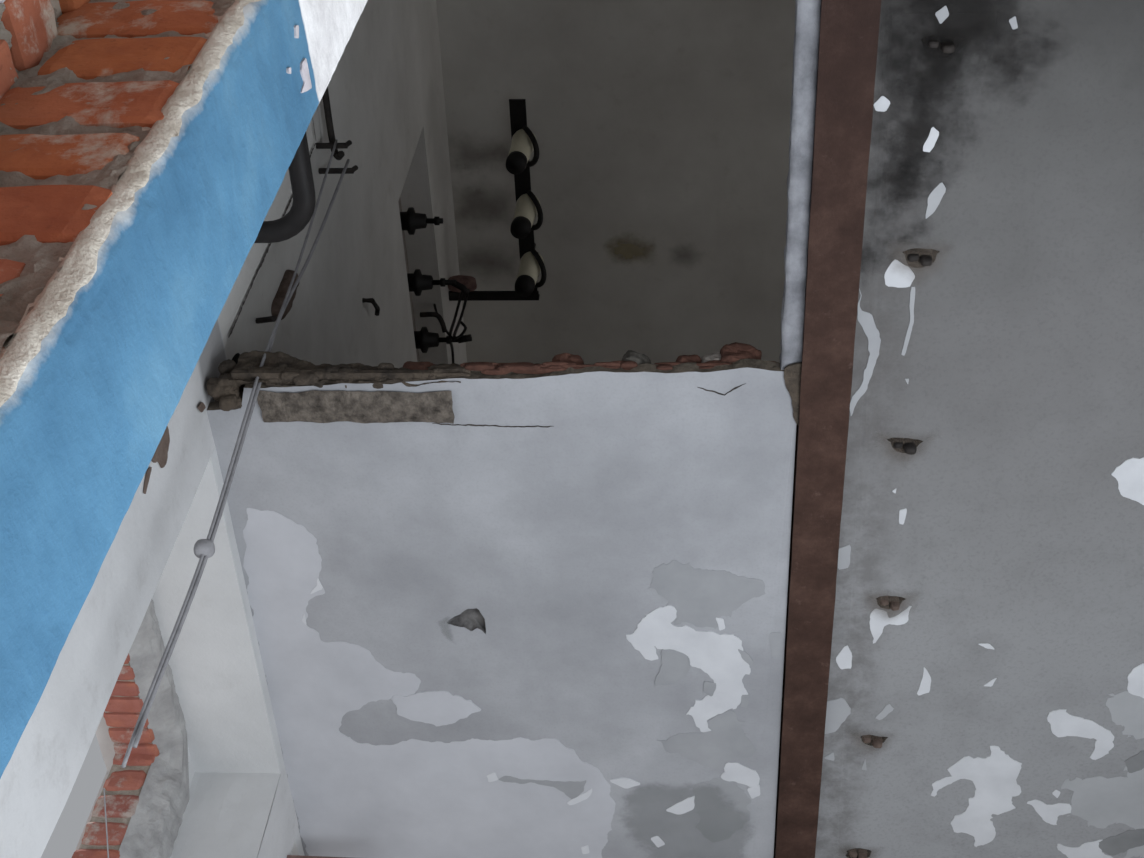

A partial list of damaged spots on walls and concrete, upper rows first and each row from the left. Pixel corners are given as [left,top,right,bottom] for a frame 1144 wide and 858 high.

spalling [198,350,638,424]
spalling [143,426,170,494]
peeling [1111,457,1144,505]
peeling [838,545,851,570]
peeling [869,596,912,643]
peeling [243,508,640,858]
peeling [626,560,766,843]
peeling [825,698,851,734]
peeling [836,645,852,669]
peeling [917,667,931,695]
spalling [861,735,888,748]
peeling [931,663,1144,858]